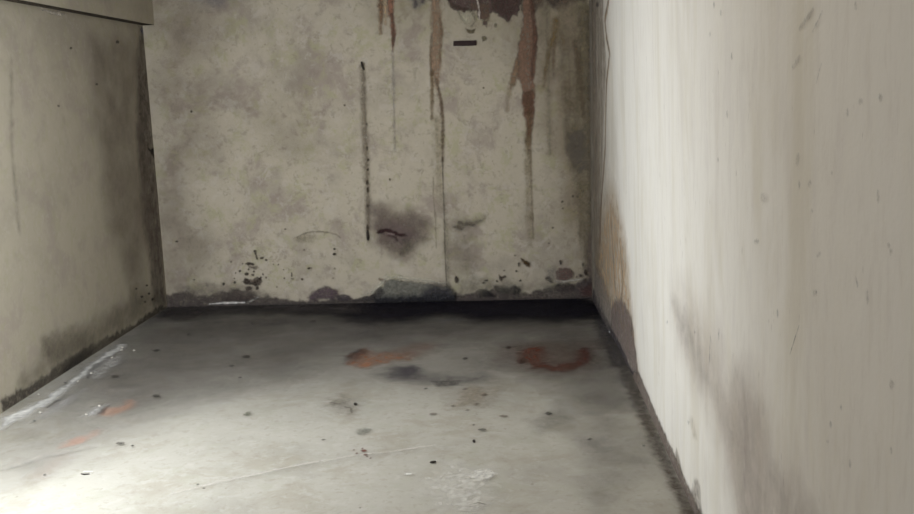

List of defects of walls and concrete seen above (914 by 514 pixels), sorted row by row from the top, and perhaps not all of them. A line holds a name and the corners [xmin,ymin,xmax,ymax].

corrosion [379,0,396,51]
peeling [448,0,520,41]
corrosion [429,0,444,158]
corrosion [510,0,559,167]
water stain [214,250,310,304]